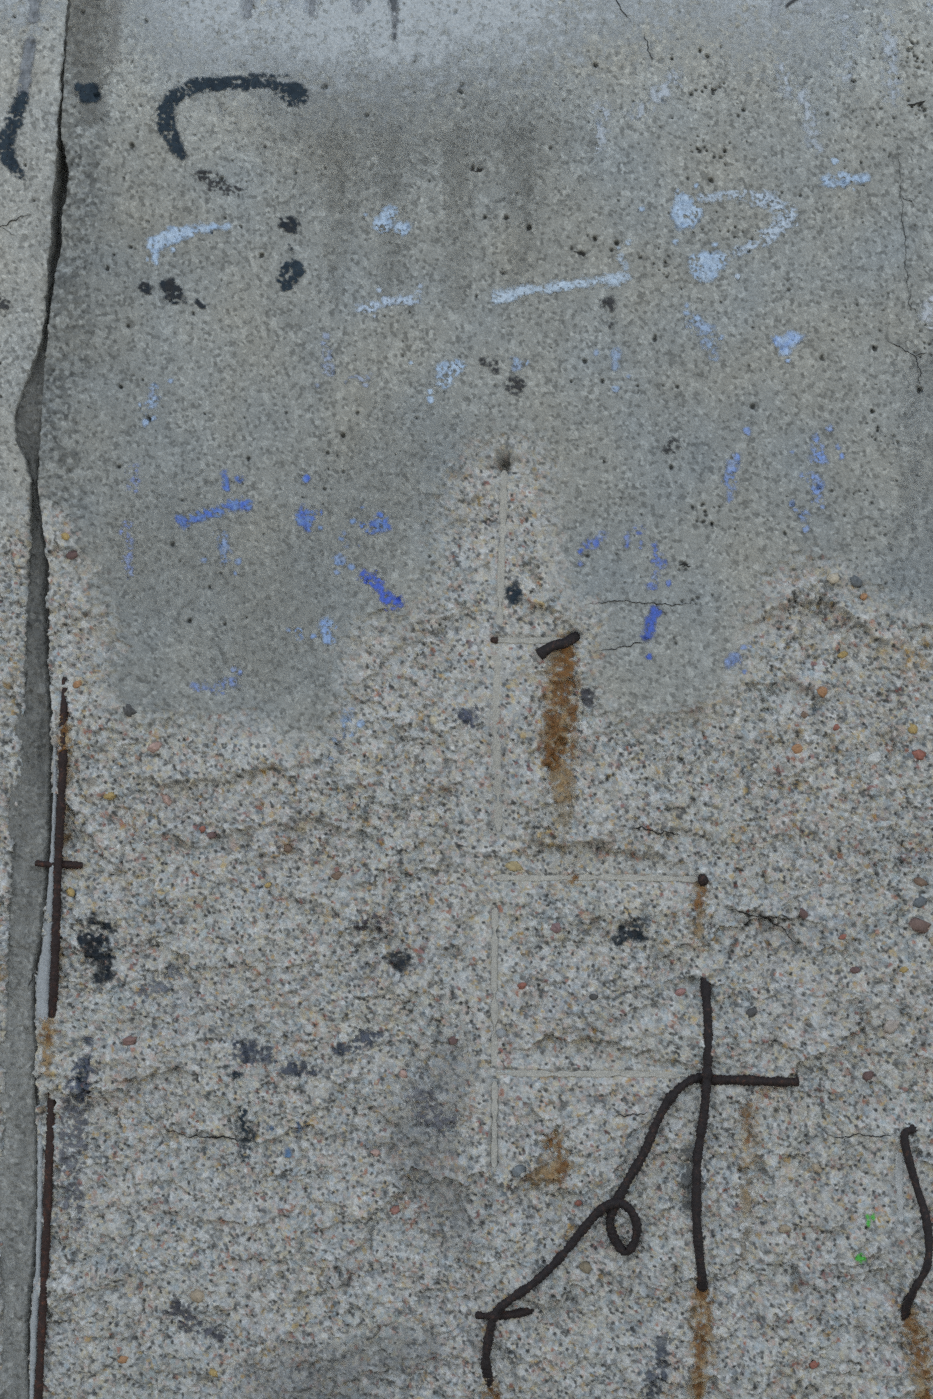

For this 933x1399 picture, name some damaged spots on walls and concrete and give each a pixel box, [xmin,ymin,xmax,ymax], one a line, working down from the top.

crack [45,557,53,712]
rust [538,635,580,849]
crack [28,747,53,1107]
spalling [0,430,933,1399]
rust [36,1017,57,1075]
rust [527,1135,574,1186]
crack [27,1141,38,1397]
rust [687,1288,716,1399]
rust [902,1308,933,1399]